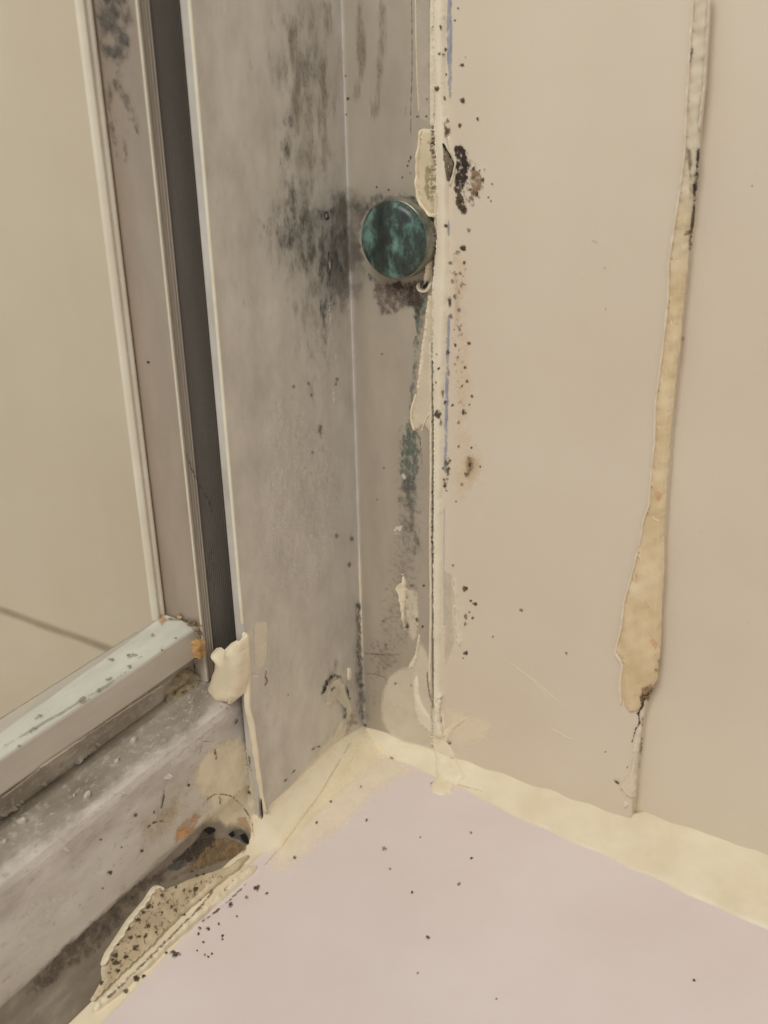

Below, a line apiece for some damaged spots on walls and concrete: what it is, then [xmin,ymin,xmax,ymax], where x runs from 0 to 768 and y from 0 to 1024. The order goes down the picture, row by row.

water stain [411,118,461,200]
water stain [454,145,493,214]
water stain [277,186,392,322]
water stain [369,278,427,345]
water stain [399,246,481,624]
crack [614,713,644,784]